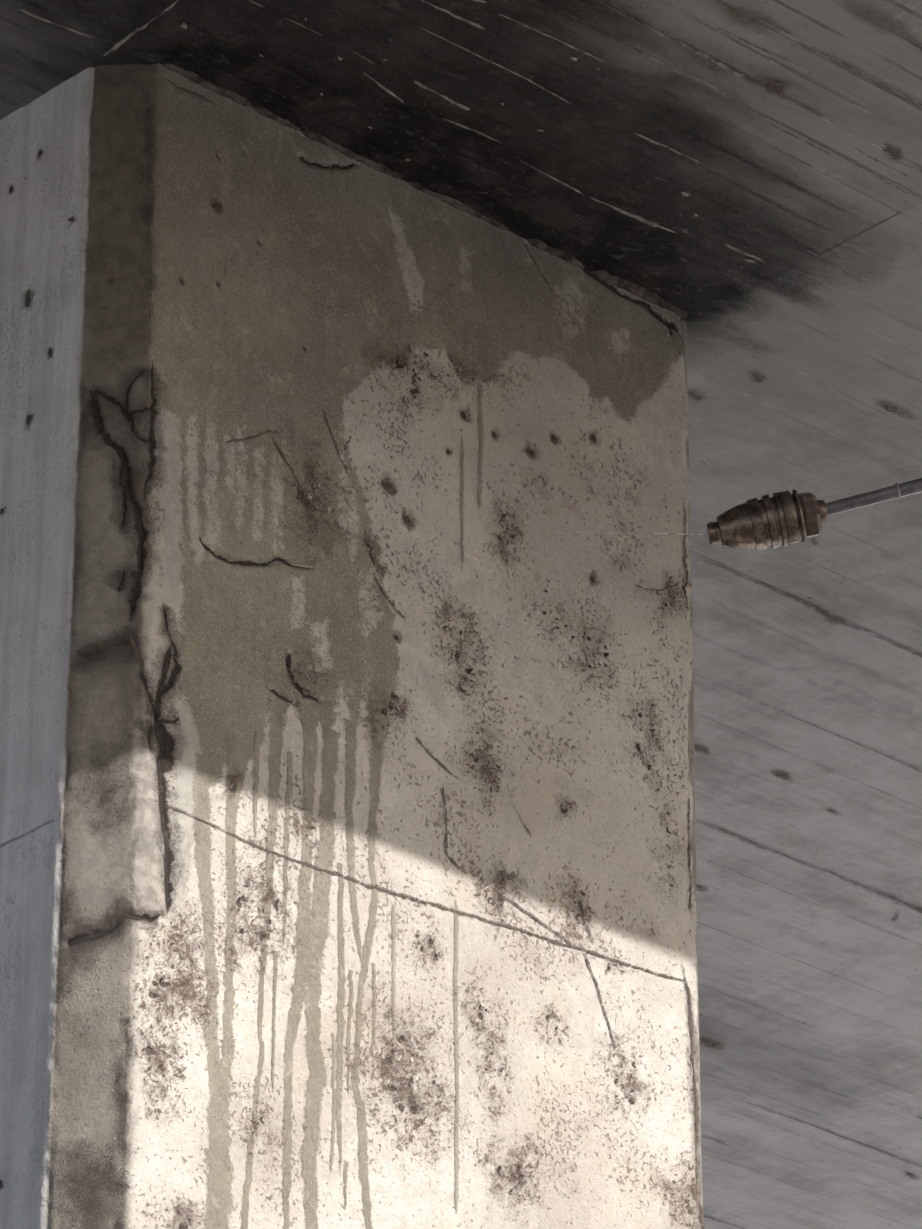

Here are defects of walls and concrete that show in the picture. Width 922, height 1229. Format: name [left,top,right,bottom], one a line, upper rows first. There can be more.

damp [82,37,750,1229]
crack [637,500,922,657]
crack [0,820,53,846]
crack [70,360,746,1229]
crack [687,798,922,921]
crack [768,706,922,772]
crack [733,1098,920,1167]